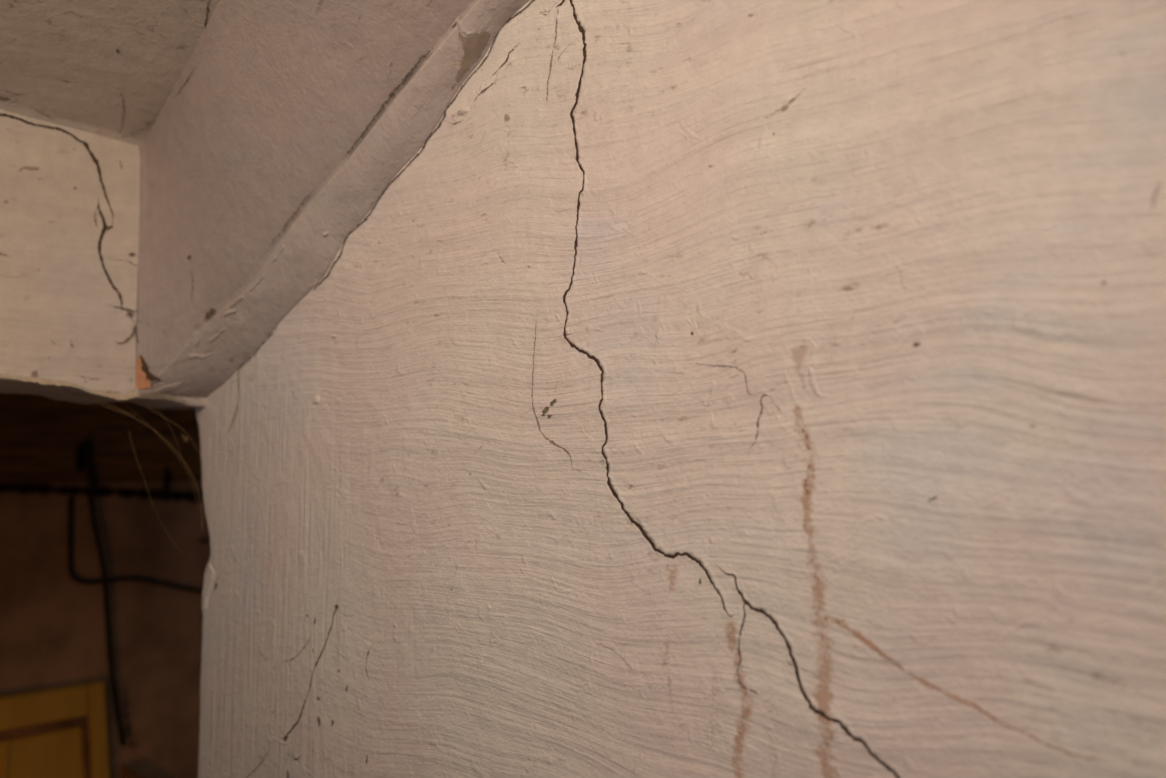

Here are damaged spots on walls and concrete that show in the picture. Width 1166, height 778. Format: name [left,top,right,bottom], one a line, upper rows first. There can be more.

crack [0,113,123,306]
crack [313,0,904,778]
rust [824,616,901,668]